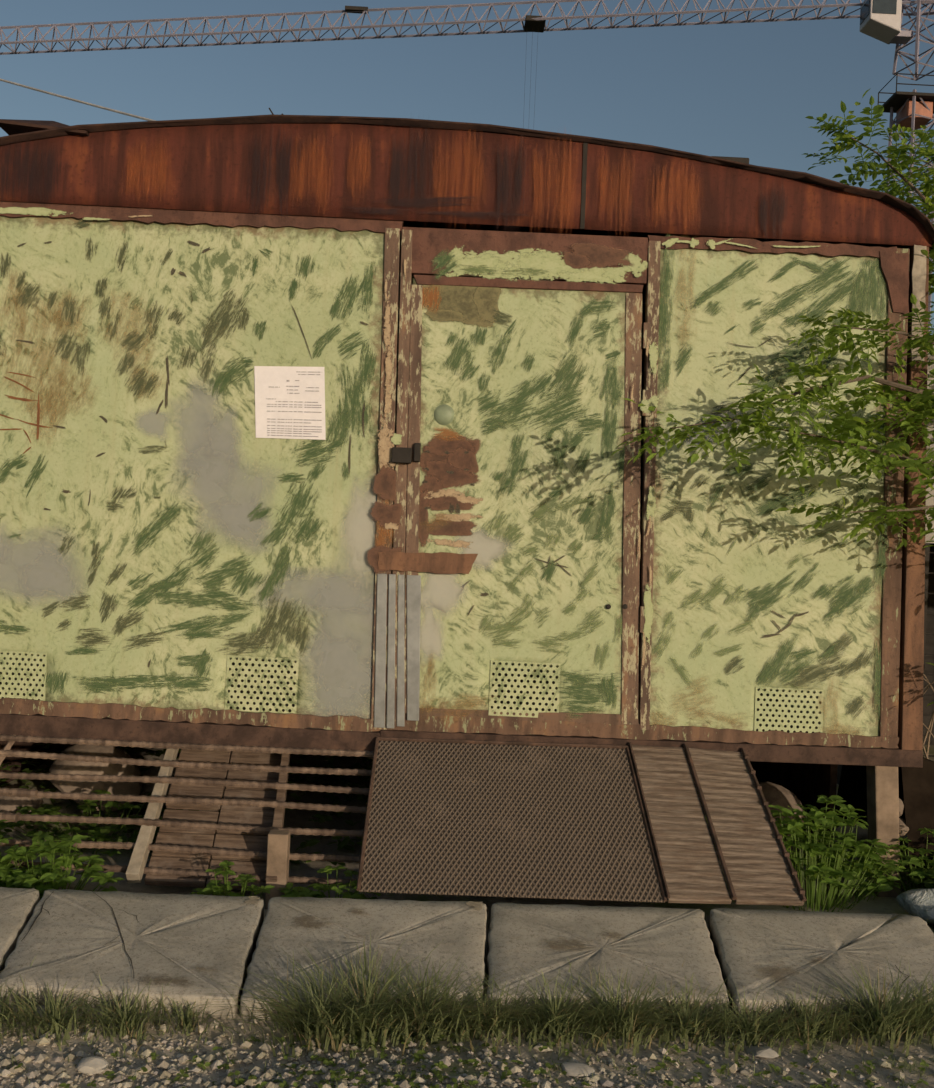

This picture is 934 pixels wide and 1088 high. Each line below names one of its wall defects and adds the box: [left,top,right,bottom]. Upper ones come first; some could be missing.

peeling [0,243,90,374]
peeling [116,240,128,271]
peeling [288,254,314,300]
peeling [744,245,888,393]
peeling [42,263,393,694]
peeling [424,234,757,653]
peeling [692,463,815,515]
peeling [0,620,30,635]
peeling [559,616,622,720]
peeling [638,483,889,685]
peeling [756,632,881,720]
crack [92,891,138,979]